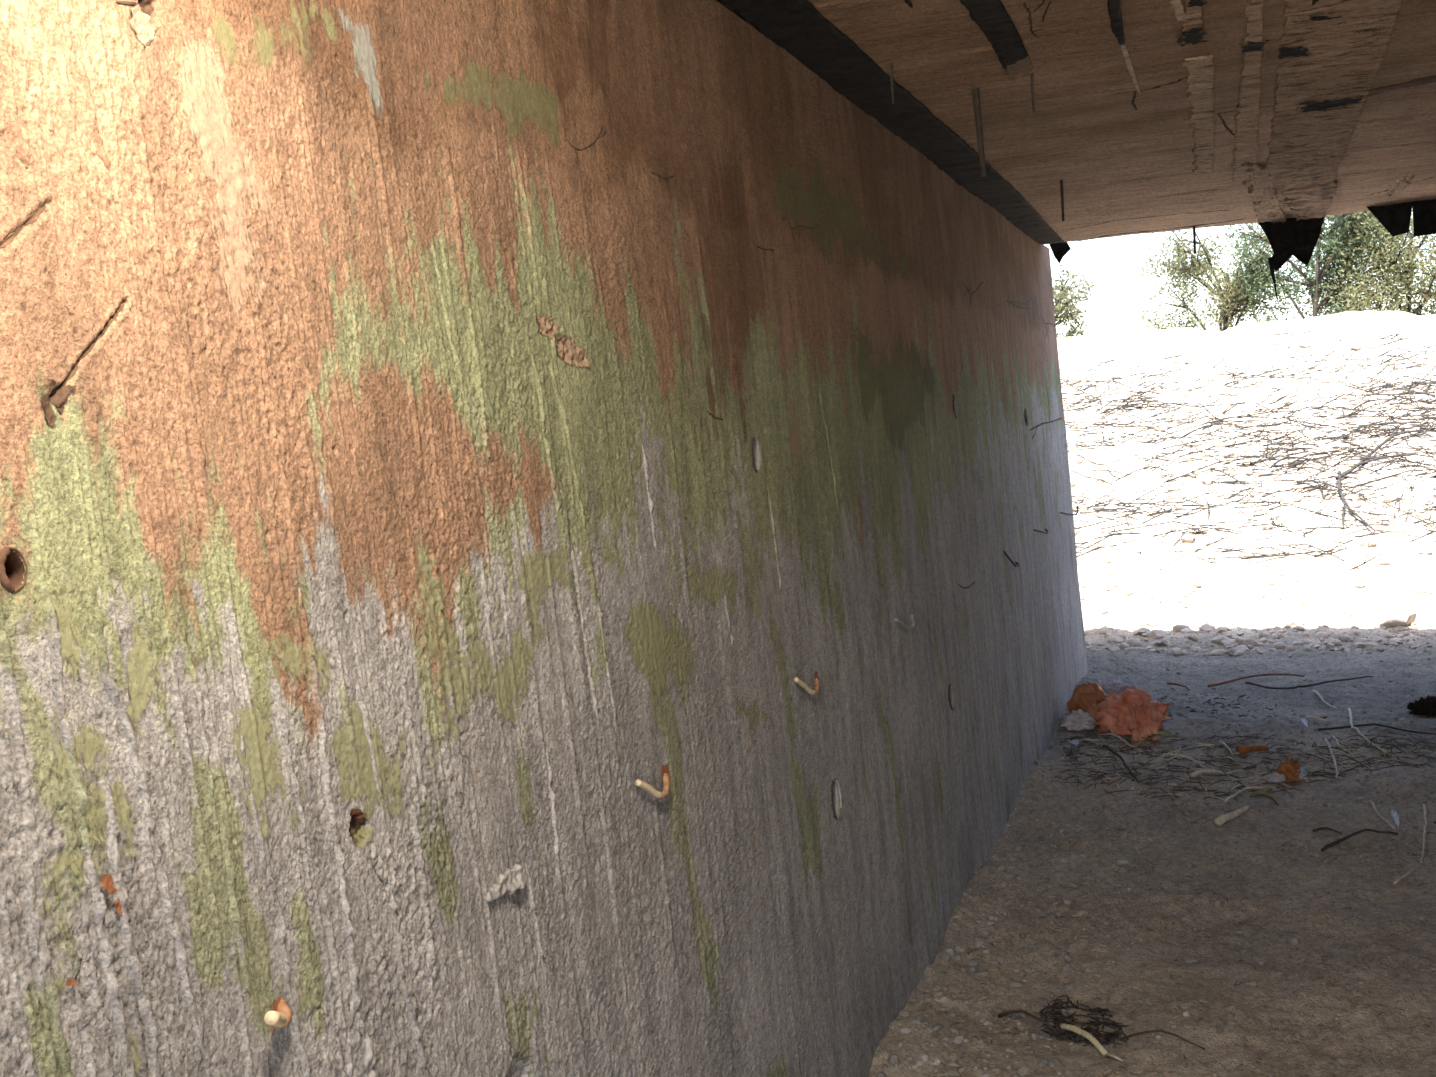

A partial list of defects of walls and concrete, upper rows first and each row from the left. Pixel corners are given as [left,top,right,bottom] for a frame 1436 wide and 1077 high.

leakage [178,21,278,317]